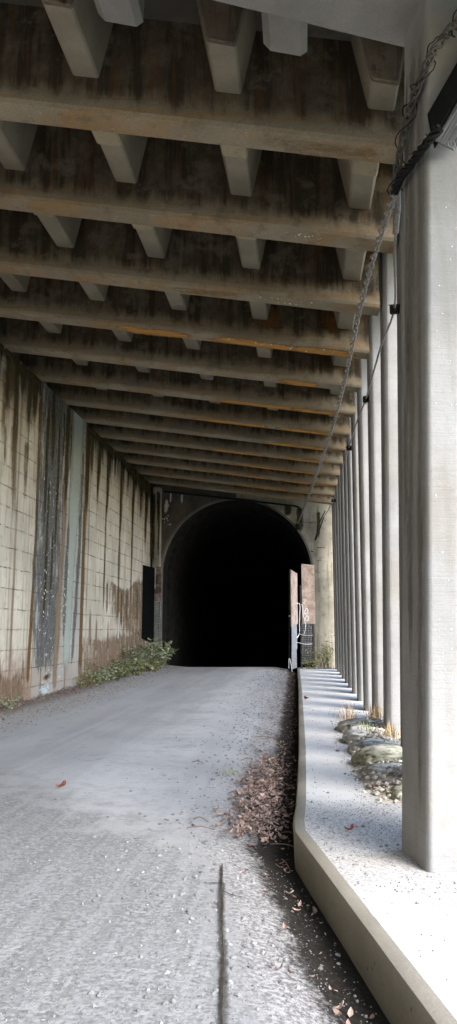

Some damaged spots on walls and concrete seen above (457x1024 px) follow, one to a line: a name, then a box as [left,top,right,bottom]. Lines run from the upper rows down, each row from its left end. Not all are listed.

water stain [0,343,183,706]